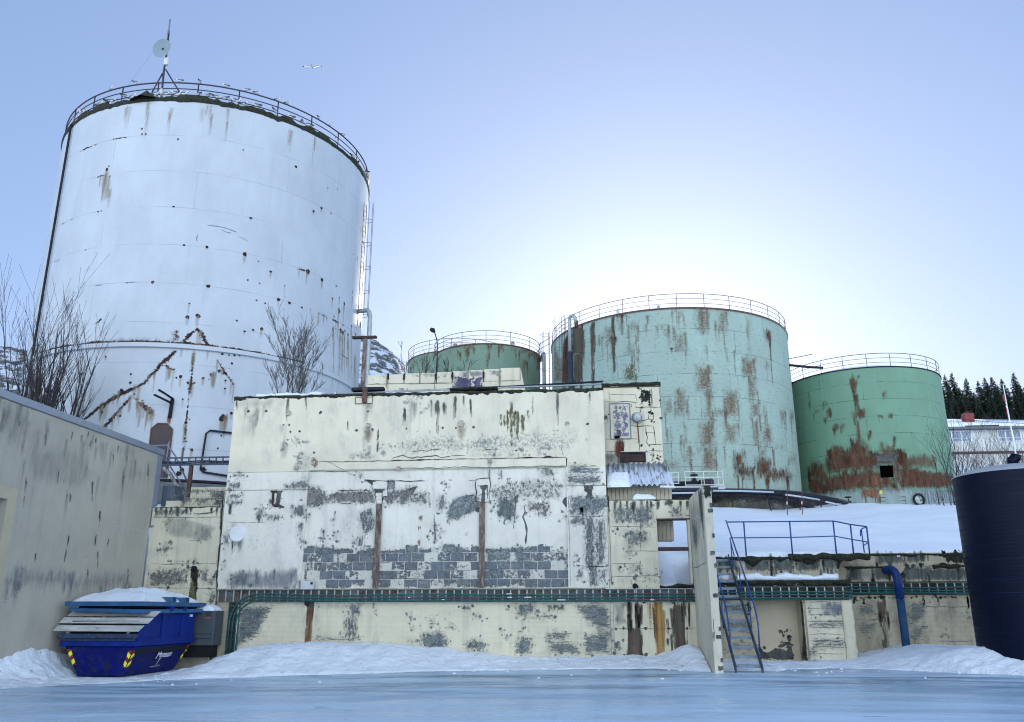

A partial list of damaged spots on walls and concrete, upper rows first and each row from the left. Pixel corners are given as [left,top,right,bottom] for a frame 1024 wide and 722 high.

corrosion [555,310,639,388]
corrosion [38,303,306,476]
damp [500,410,528,440]
corrosion [614,430,624,464]
corrosion [665,359,953,504]
peeling [255,424,663,657]
damp [627,602,690,656]
damp [758,600,808,661]